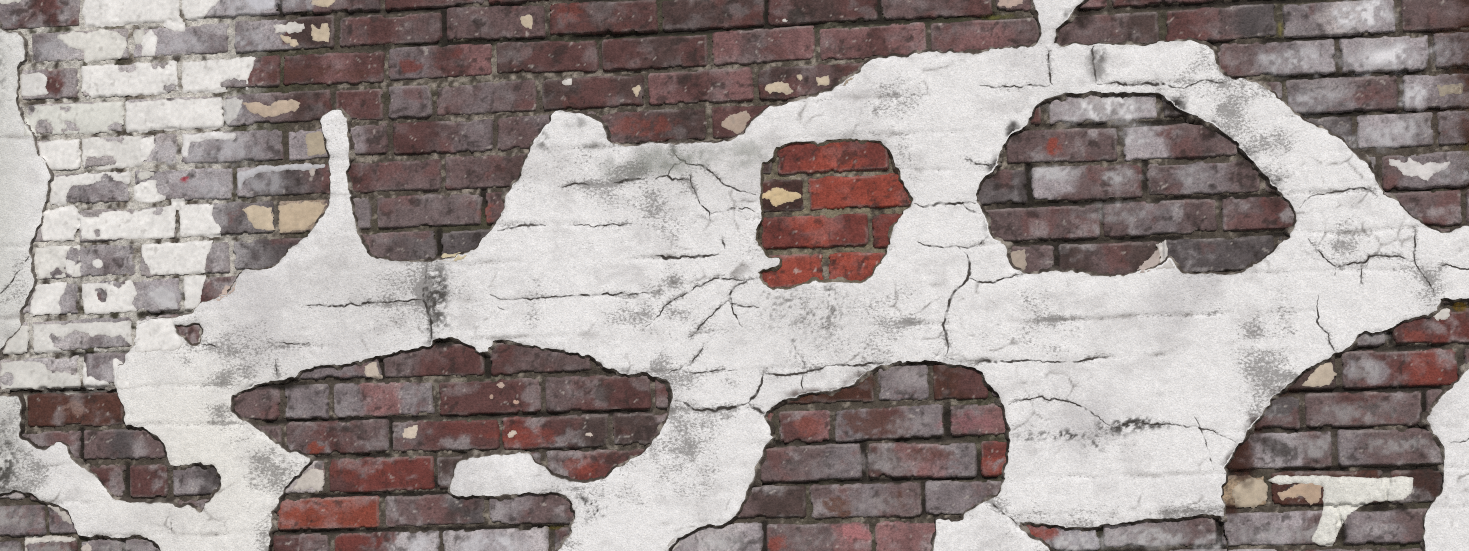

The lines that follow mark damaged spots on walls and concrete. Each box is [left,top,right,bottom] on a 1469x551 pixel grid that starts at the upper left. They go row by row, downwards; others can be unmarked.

spalling [0,490,161,551]
spalling [231,337,673,551]
spalling [0,0,1042,513]
crack [495,150,875,414]
spalling [667,360,1011,551]
crack [915,202,1105,423]
spalling [976,90,1297,277]
crack [1142,421,1216,461]
spalling [1019,298,1469,551]
spalling [1054,0,1469,233]
crack [1316,300,1334,350]
crack [1319,236,1469,290]